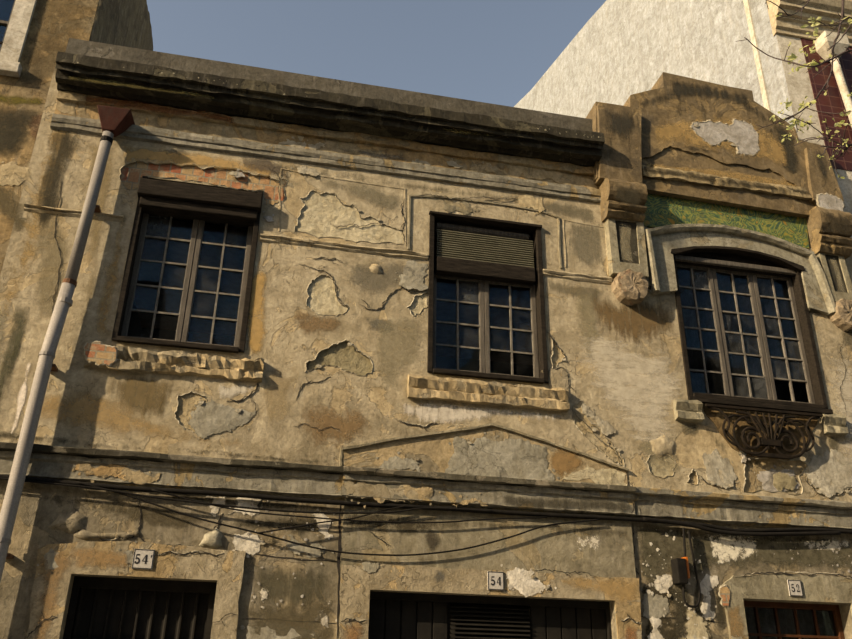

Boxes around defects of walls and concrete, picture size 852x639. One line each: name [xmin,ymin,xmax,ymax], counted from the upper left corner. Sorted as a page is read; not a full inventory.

damp [0,109,33,155]
peeling [690,118,760,157]
peeling [118,160,288,222]
peeling [290,166,321,177]
damp [0,130,75,311]
crack [304,257,419,310]
peeling [174,391,208,434]
peeling [305,339,374,377]
crack [546,331,621,462]
damp [551,284,679,475]
peeling [728,450,808,495]
crack [734,571,852,579]